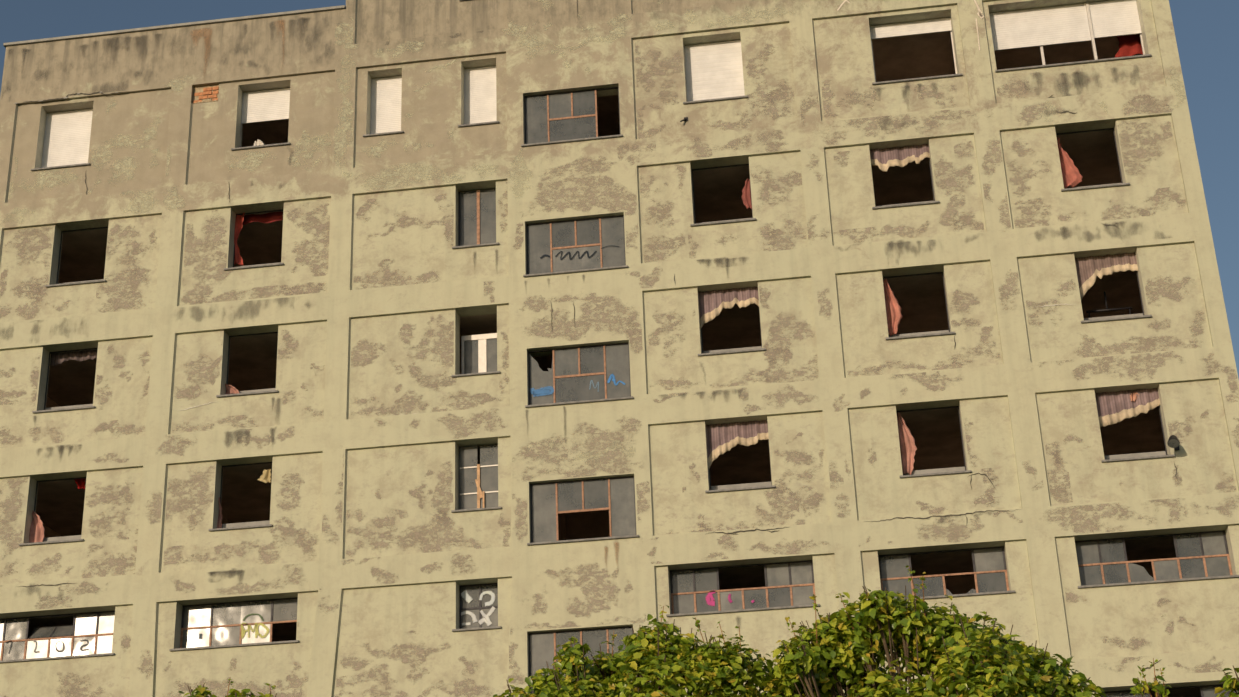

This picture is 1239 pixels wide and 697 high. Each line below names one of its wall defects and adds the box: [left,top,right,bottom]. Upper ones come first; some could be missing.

spalling [168,79,219,104]
peeling [688,44,970,164]
peeling [537,46,698,287]
peeling [181,204,330,304]
peeling [358,316,509,439]
peeling [524,293,682,356]
peeling [1074,312,1203,380]
peeling [149,467,213,525]
peeling [164,462,480,594]
crack [712,527,779,535]
crack [868,473,1018,525]
peeling [531,565,632,628]